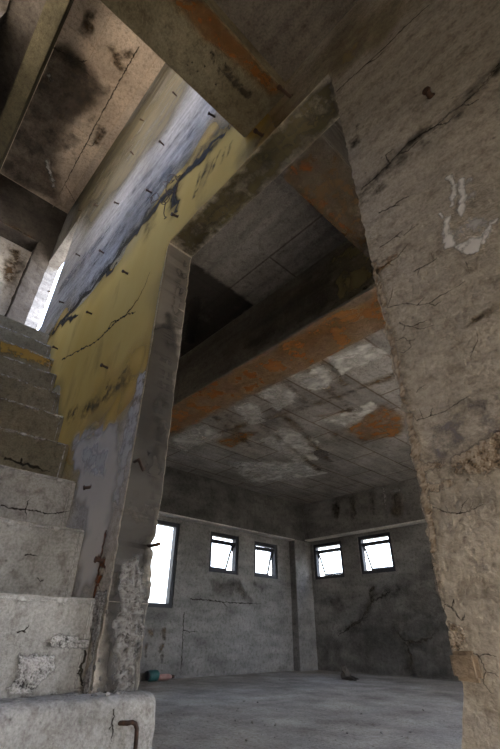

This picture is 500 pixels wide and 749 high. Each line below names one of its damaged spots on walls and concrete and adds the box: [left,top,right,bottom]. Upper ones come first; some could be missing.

damp [1,48,104,199]
damp [82,12,94,33]
damp [108,47,133,71]
rust [174,0,281,93]
crack [52,126,231,335]
crack [0,500,68,515]
crack [62,275,149,360]
damp [74,269,394,693]
rust [169,293,385,435]
rust [348,406,403,441]
spalling [371,260,500,592]
spalling [0,554,147,702]